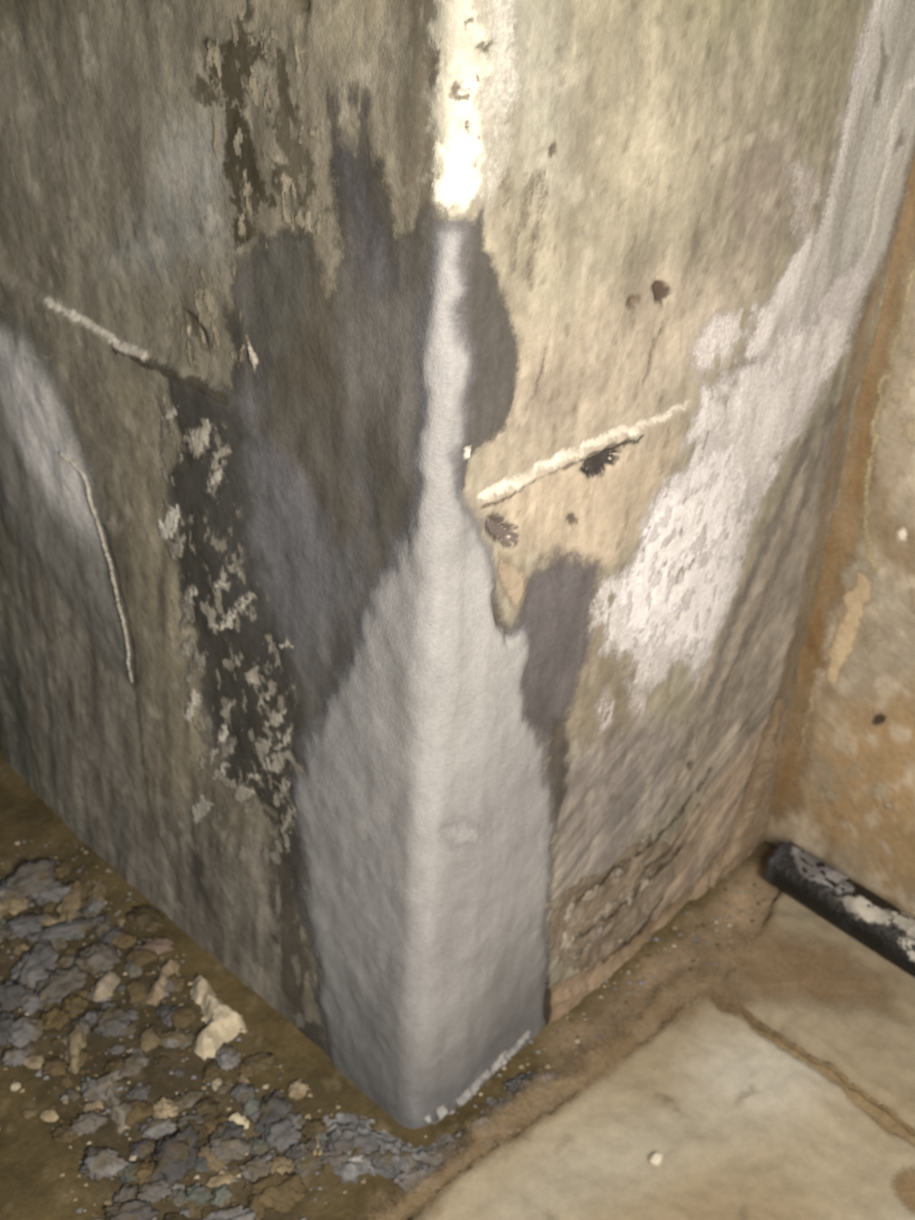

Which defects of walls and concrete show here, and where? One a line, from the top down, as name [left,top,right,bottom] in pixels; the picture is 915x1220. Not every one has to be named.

spalling [194,0,325,276]
crack [43,296,227,405]
spalling [165,259,258,371]
flaking render [157,396,305,873]
leakage [165,0,519,1051]
crack [477,400,690,508]
leakage [492,0,915,821]